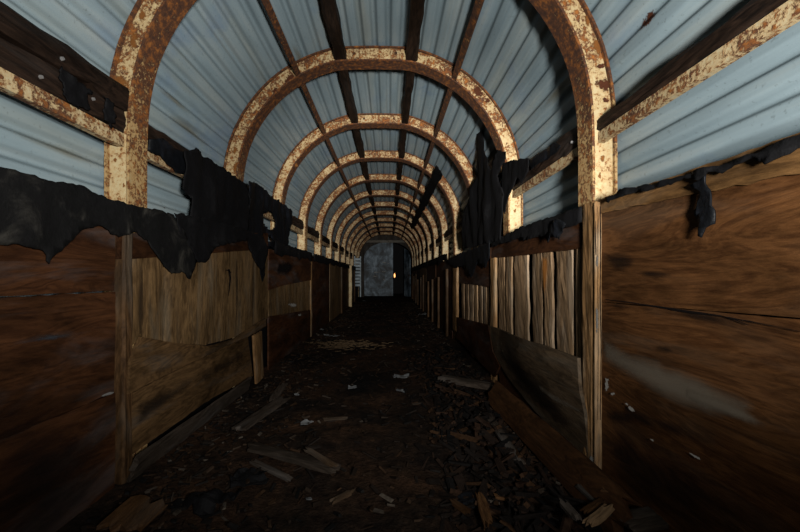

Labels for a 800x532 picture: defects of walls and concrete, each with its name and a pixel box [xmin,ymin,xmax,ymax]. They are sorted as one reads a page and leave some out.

rust [595,79,609,102]
crack [593,206,800,420]